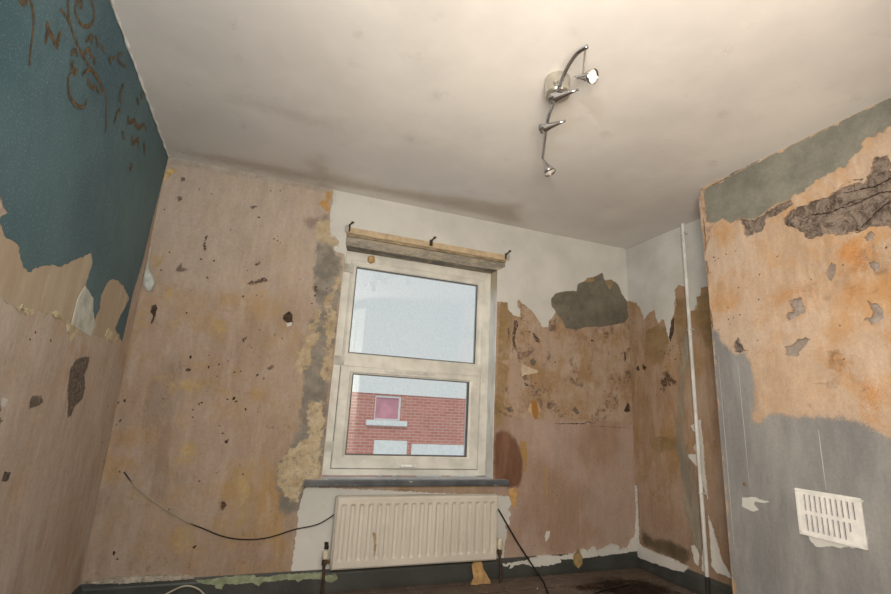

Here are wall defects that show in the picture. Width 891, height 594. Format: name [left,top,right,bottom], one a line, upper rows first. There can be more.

spalling [740,156,891,242]
spalling [787,297,806,321]
spalling [866,301,884,325]
spalling [786,338,810,357]
damp [493,302,527,489]
peeling [688,419,708,499]
peeling [196,487,457,589]
peeling [496,495,511,558]
peeling [691,545,699,566]
peeling [708,516,732,578]